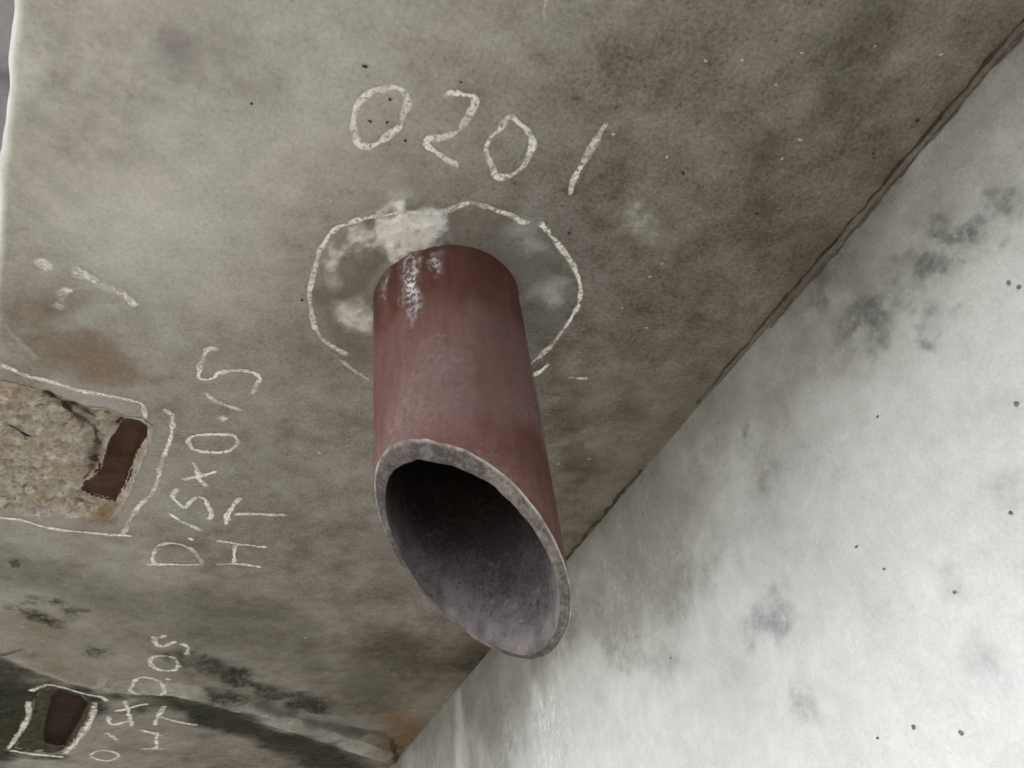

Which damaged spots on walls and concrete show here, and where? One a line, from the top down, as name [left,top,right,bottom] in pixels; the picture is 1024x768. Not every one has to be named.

water stain [326,200,448,296]
water stain [324,290,374,350]
spalling [0,381,154,522]
spalling [14,689,93,754]
water stain [0,660,388,768]